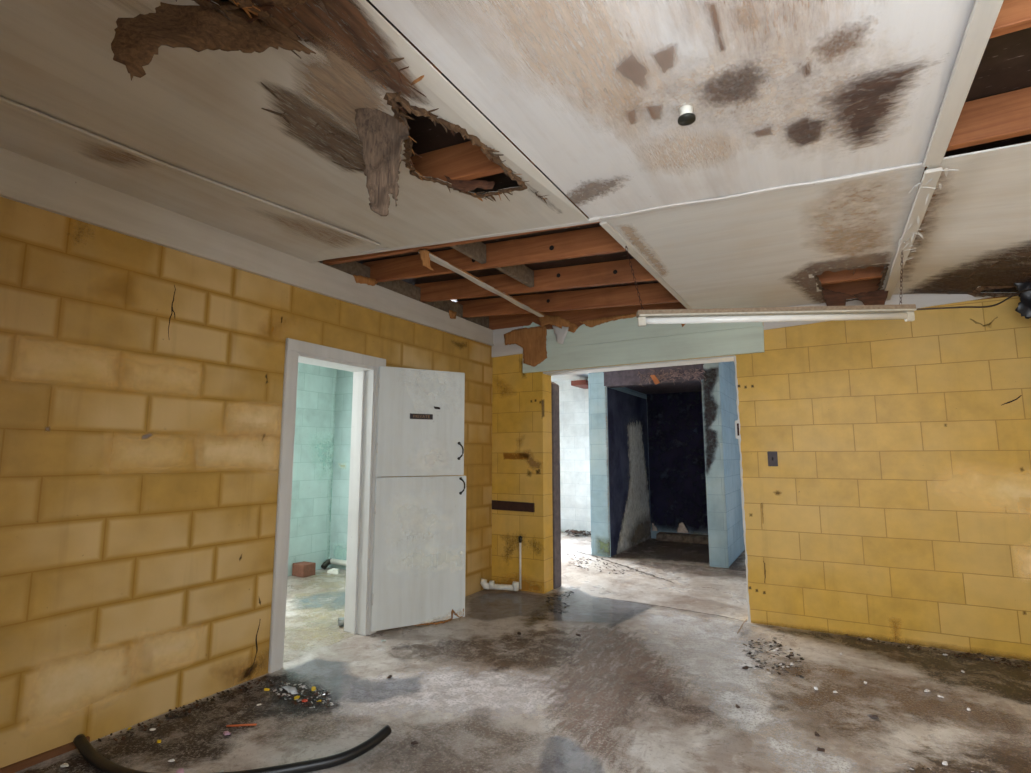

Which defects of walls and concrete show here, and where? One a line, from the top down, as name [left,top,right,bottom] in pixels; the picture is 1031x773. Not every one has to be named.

peeling [219,0,470,191]
water stain [495,0,675,124]
water stain [709,0,725,51]
water stain [705,65,763,106]
water stain [819,27,866,58]
water stain [787,65,926,149]
peeling [471,171,547,203]
water stain [910,244,1031,294]
crack [168,285,176,337]